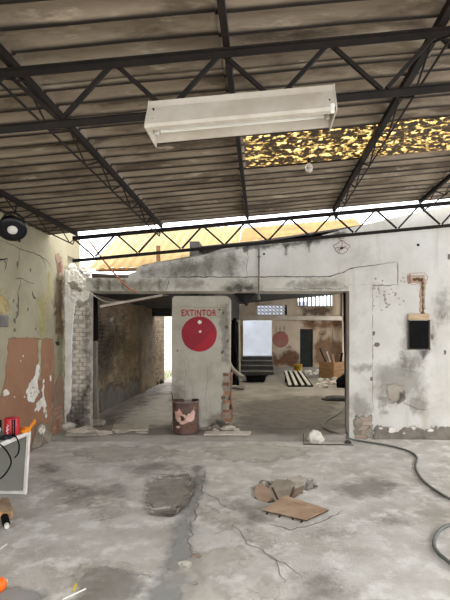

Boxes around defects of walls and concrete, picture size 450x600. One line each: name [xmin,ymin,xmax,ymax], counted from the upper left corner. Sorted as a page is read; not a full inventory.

crack [3,241,49,293]
flaking render [24,253,92,450]
crack [166,249,428,408]
flaking render [200,372,233,430]
spalling [353,415,373,439]
crack [148,471,302,582]
crack [271,510,343,531]